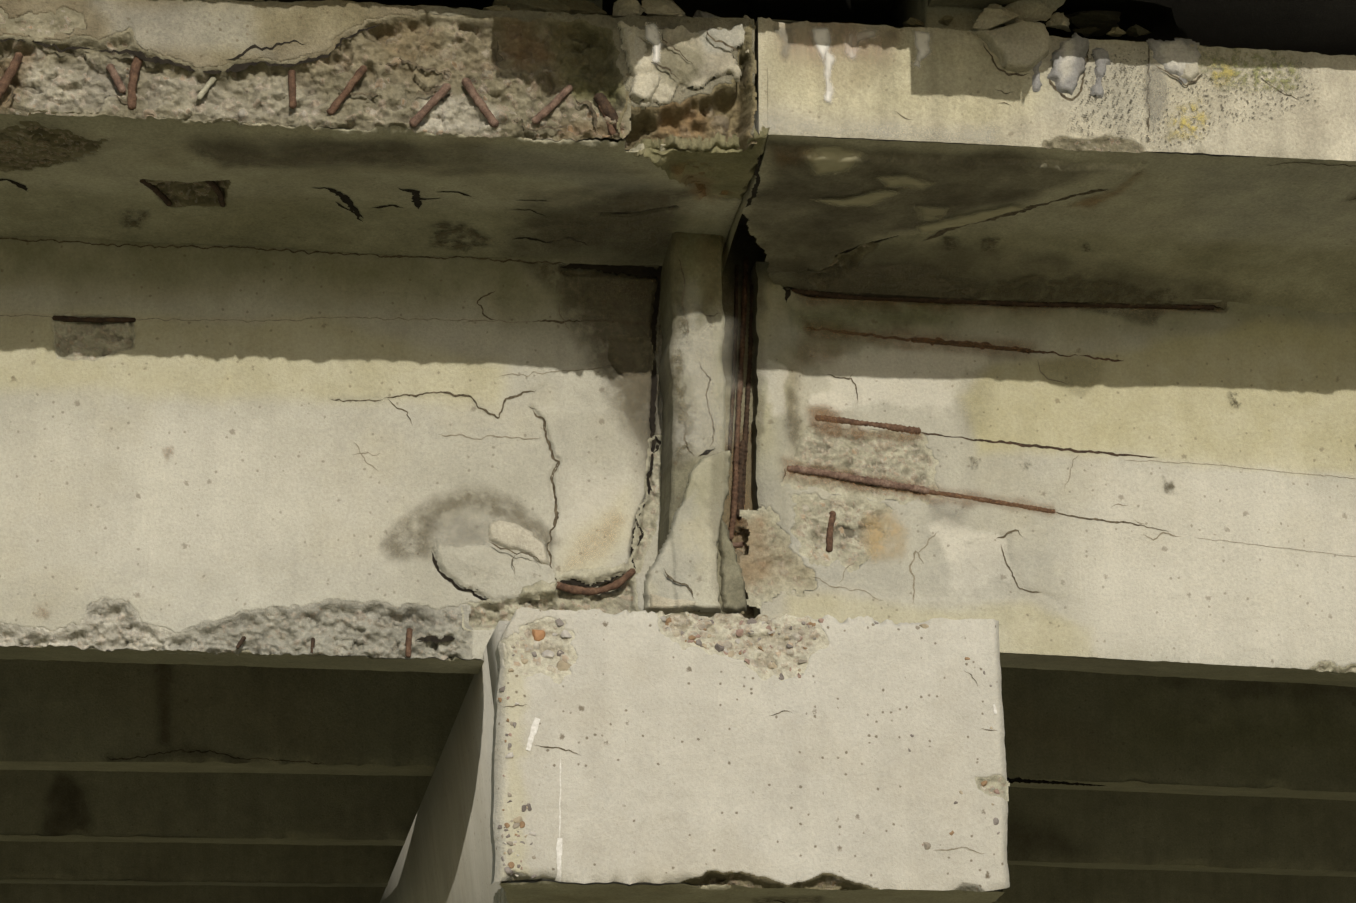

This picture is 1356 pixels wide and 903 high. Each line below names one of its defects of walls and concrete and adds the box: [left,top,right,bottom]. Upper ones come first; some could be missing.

leakage [808,23,875,101]
leakage [915,31,930,65]
spalling [0,0,770,199]
spalling [139,179,231,207]
crack [316,187,471,222]
crack [0,200,721,582]
leakage [390,496,548,553]
spalling [0,256,1224,758]
crack [432,553,490,604]
crack [997,529,1039,593]
spalling [498,775,572,883]
spalling [954,775,1010,835]